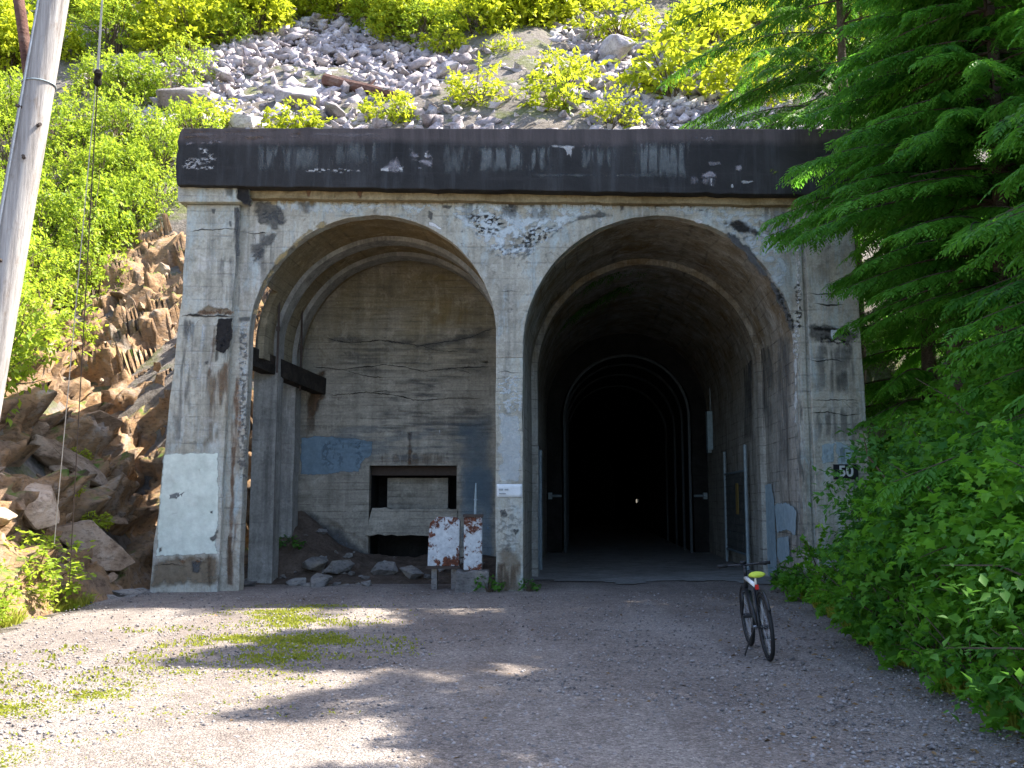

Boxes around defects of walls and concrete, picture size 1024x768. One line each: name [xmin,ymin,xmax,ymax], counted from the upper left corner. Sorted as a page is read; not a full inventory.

leakage [262,201,353,288]
peeling [402,203,602,255]
crack [316,329,511,401]
rust [208,364,241,567]